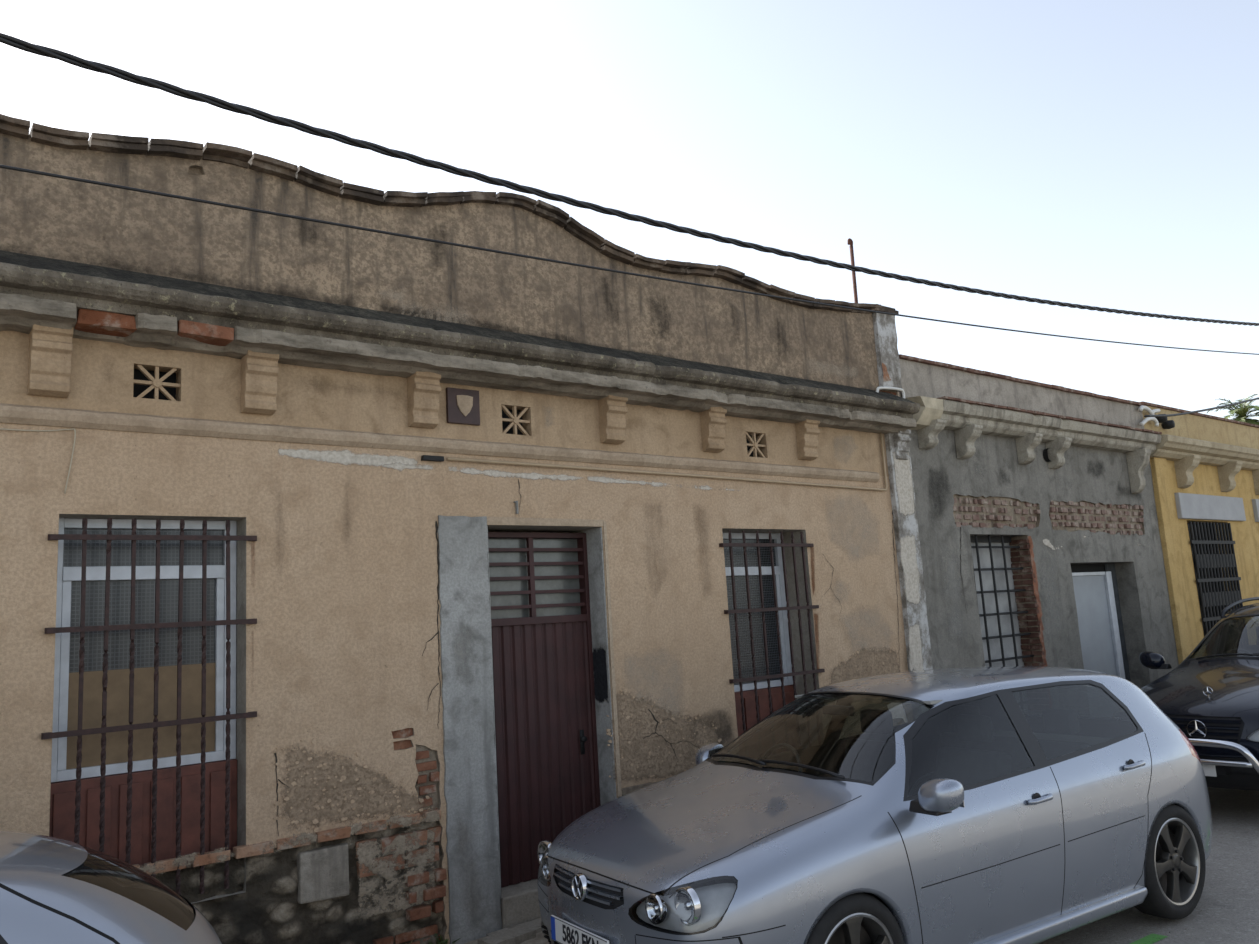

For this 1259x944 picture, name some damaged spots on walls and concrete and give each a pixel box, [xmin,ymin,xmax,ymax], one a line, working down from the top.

flaking render [75,309,137,337]
flaking render [177,320,234,346]
flaking render [953,494,1145,666]
peeling [606,690,722,798]
flaking render [133,728,447,944]